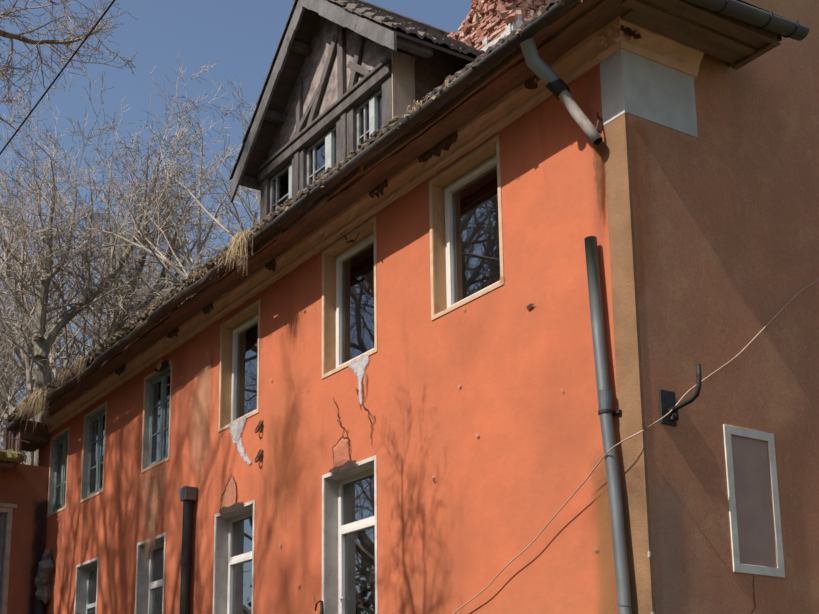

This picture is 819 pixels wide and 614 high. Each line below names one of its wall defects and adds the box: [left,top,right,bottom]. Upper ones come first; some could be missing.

crack [356,375,375,444]
flaking render [219,469,243,515]
leakage [29,501,47,614]